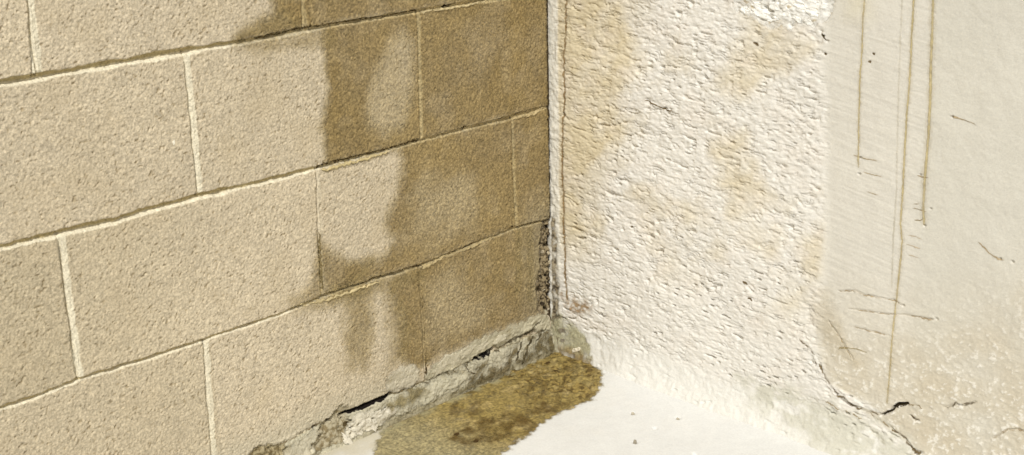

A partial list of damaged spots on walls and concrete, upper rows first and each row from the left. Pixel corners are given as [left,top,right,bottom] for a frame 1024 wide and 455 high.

damp [244,0,550,366]
crack [254,0,568,446]
peeling [311,404,397,453]
damp [374,315,602,455]
crack [800,340,922,455]